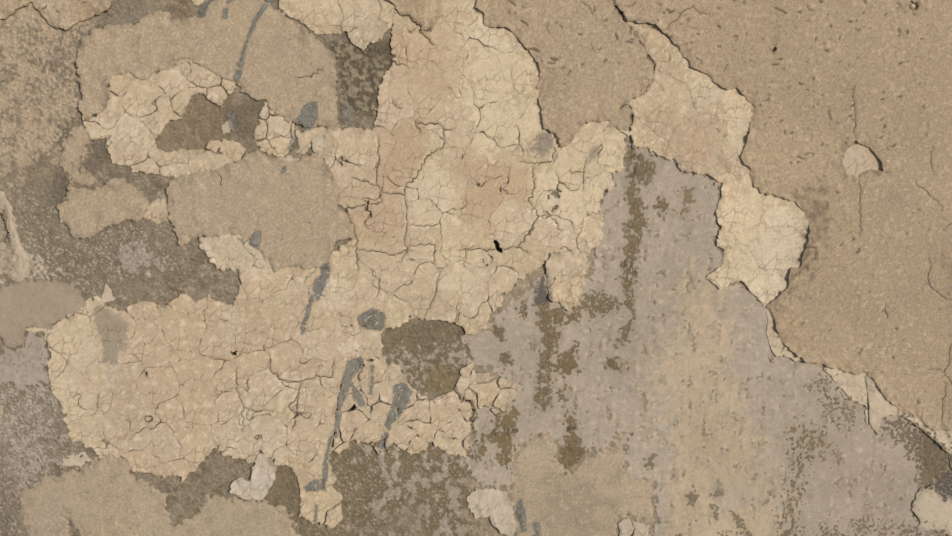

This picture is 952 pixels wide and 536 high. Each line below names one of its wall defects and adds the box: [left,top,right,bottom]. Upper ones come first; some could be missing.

crack [403,14,432,45]
crack [345,100,450,315]
peeling [56,0,809,335]
crack [458,130,560,267]
peeling [328,0,952,536]
peeling [0,233,383,536]
crack [236,362,334,431]
crack [455,391,475,426]